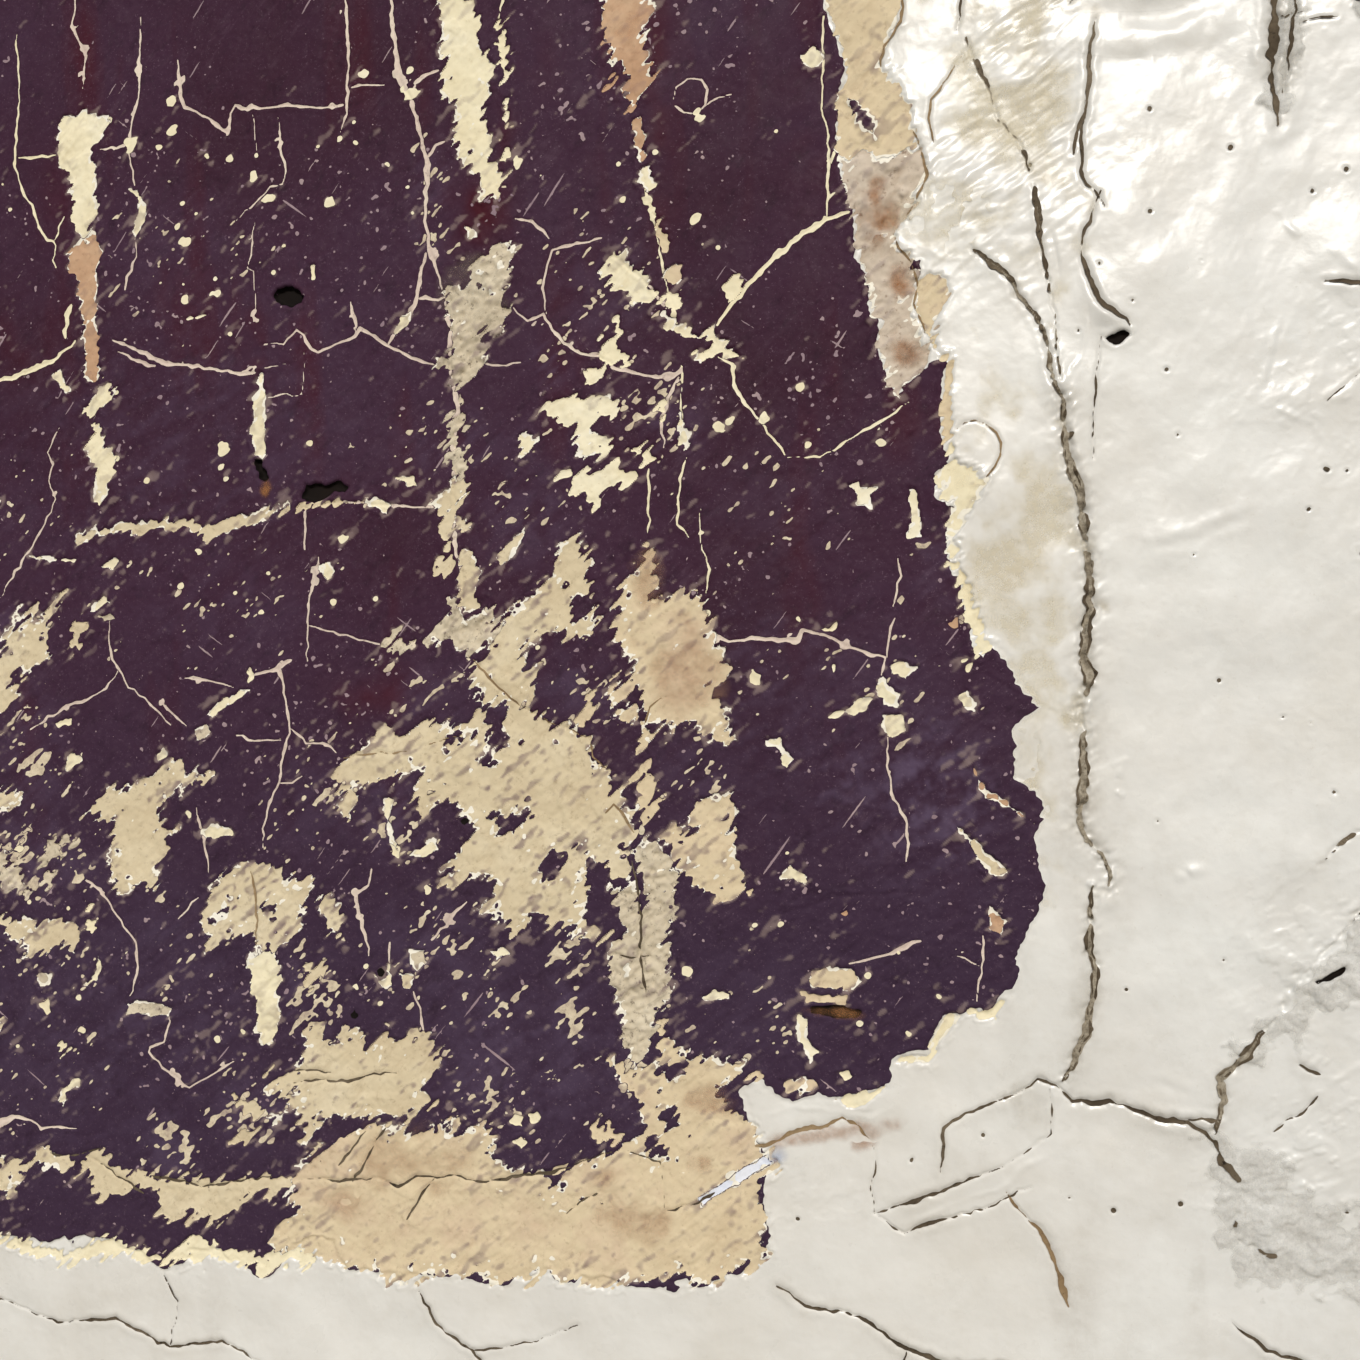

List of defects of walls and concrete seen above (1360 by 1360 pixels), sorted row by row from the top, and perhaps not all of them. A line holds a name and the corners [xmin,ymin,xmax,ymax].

peeling [56,109,120,506]
crack [30,0,467,945]
peeling [0,204,862,1290]
peeling [424,0,514,202]
crack [513,218,711,591]
peeling [599,0,660,192]
crack [716,558,902,676]
crack [716,16,909,458]
peeling [828,655,925,750]
peeling [957,827,1007,876]
crack [755,730,1265,1307]
crack [893,0,1131,697]